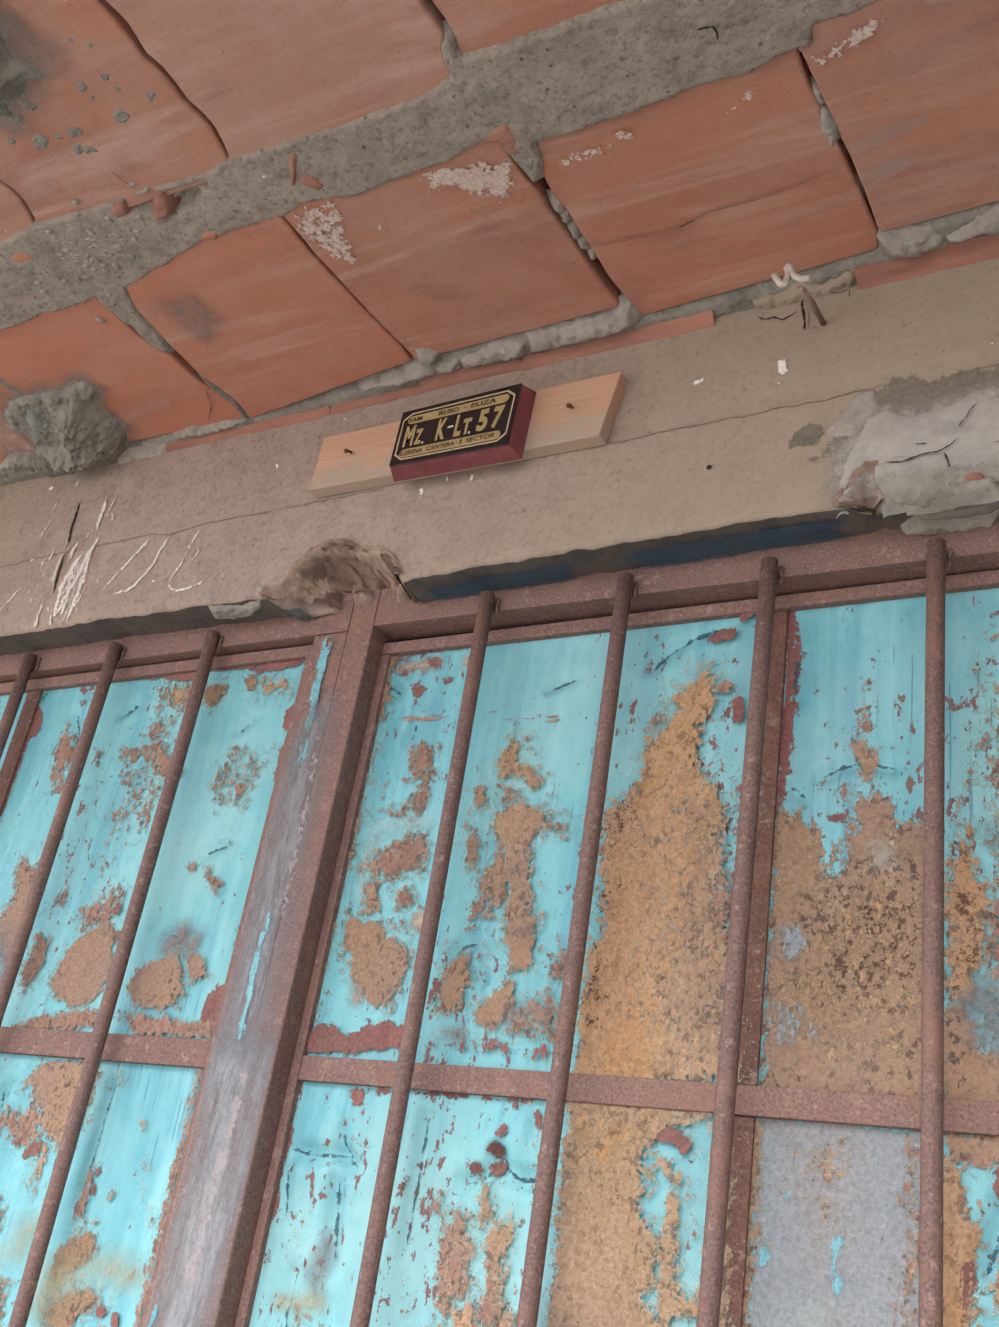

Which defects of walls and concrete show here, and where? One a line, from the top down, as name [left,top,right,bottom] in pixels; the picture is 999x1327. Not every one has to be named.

spalling [832,460,886,509]
crack [53,504,80,594]
spalling [203,538,412,619]